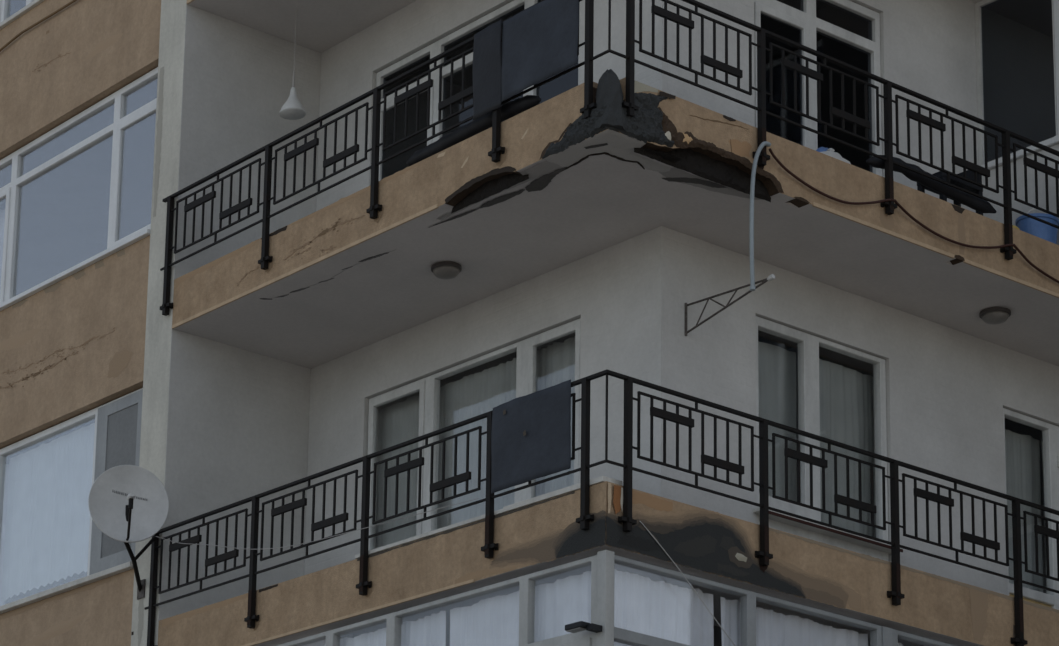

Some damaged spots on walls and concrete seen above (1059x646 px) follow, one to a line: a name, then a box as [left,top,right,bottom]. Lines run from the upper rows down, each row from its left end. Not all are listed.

spalling [634,81,811,204]
spalling [445,166,529,214]
crack [237,215,364,286]
crack [0,327,115,389]
damp [455,508,861,611]